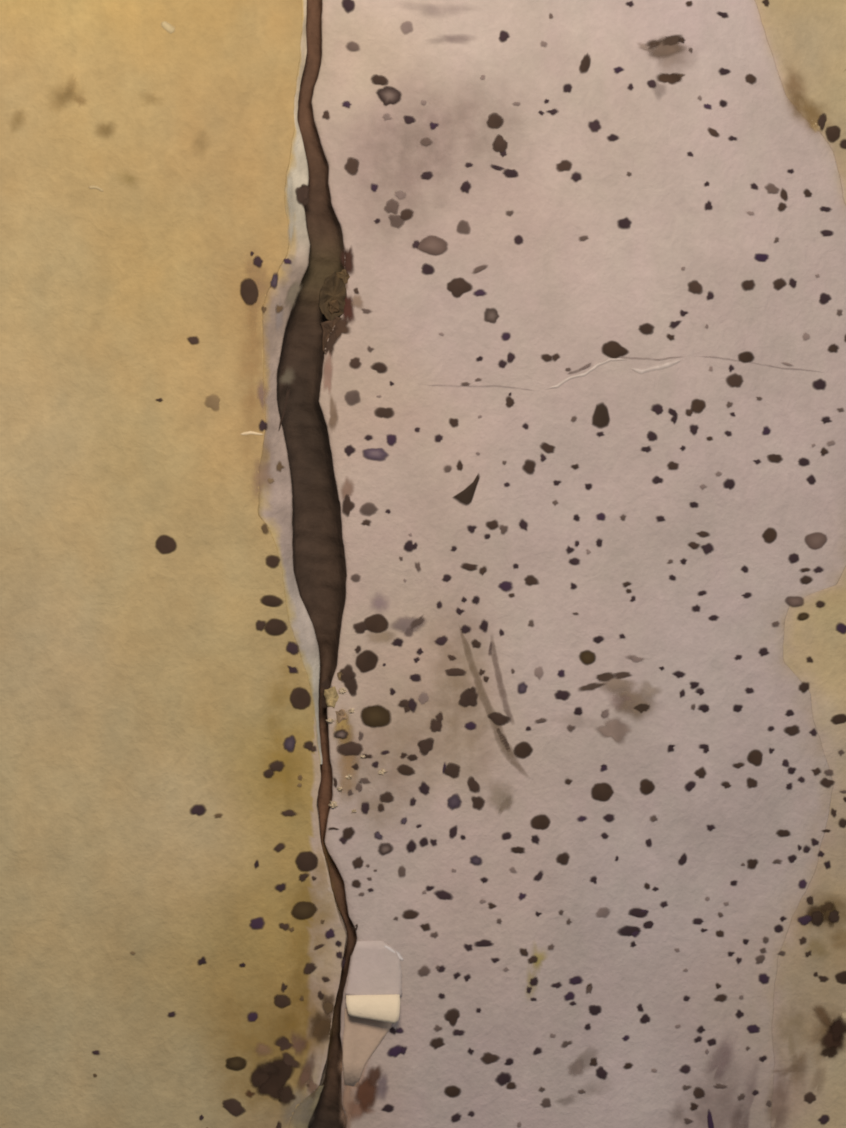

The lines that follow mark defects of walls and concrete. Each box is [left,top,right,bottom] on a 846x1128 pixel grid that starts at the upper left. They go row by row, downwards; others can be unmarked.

damp [372,75,415,124]
damp [487,113,518,177]
mould [447,265,487,297]
damp [593,403,610,436]
mould [652,399,712,440]
crack [277,0,358,1128]
peeling [258,0,846,1128]
damp [555,636,655,742]
damp [334,648,443,814]
damp [443,763,484,810]
damp [592,765,614,839]
damp [223,963,334,1128]